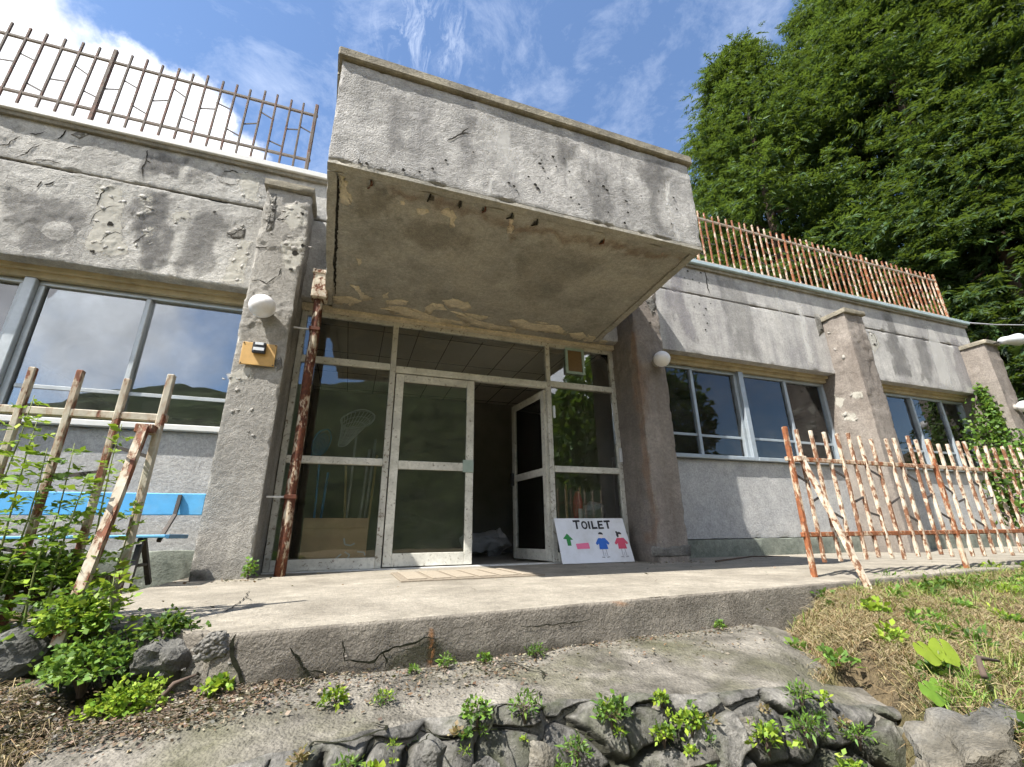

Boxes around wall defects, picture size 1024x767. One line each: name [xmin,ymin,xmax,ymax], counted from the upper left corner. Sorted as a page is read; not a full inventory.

water stain [140,153,187,176]
peeling [86,183,155,256]
water stain [133,193,173,268]
peeling [221,165,312,271]
crack [332,176,340,294]
peeling [333,285,608,345]
crack [290,637,436,678]